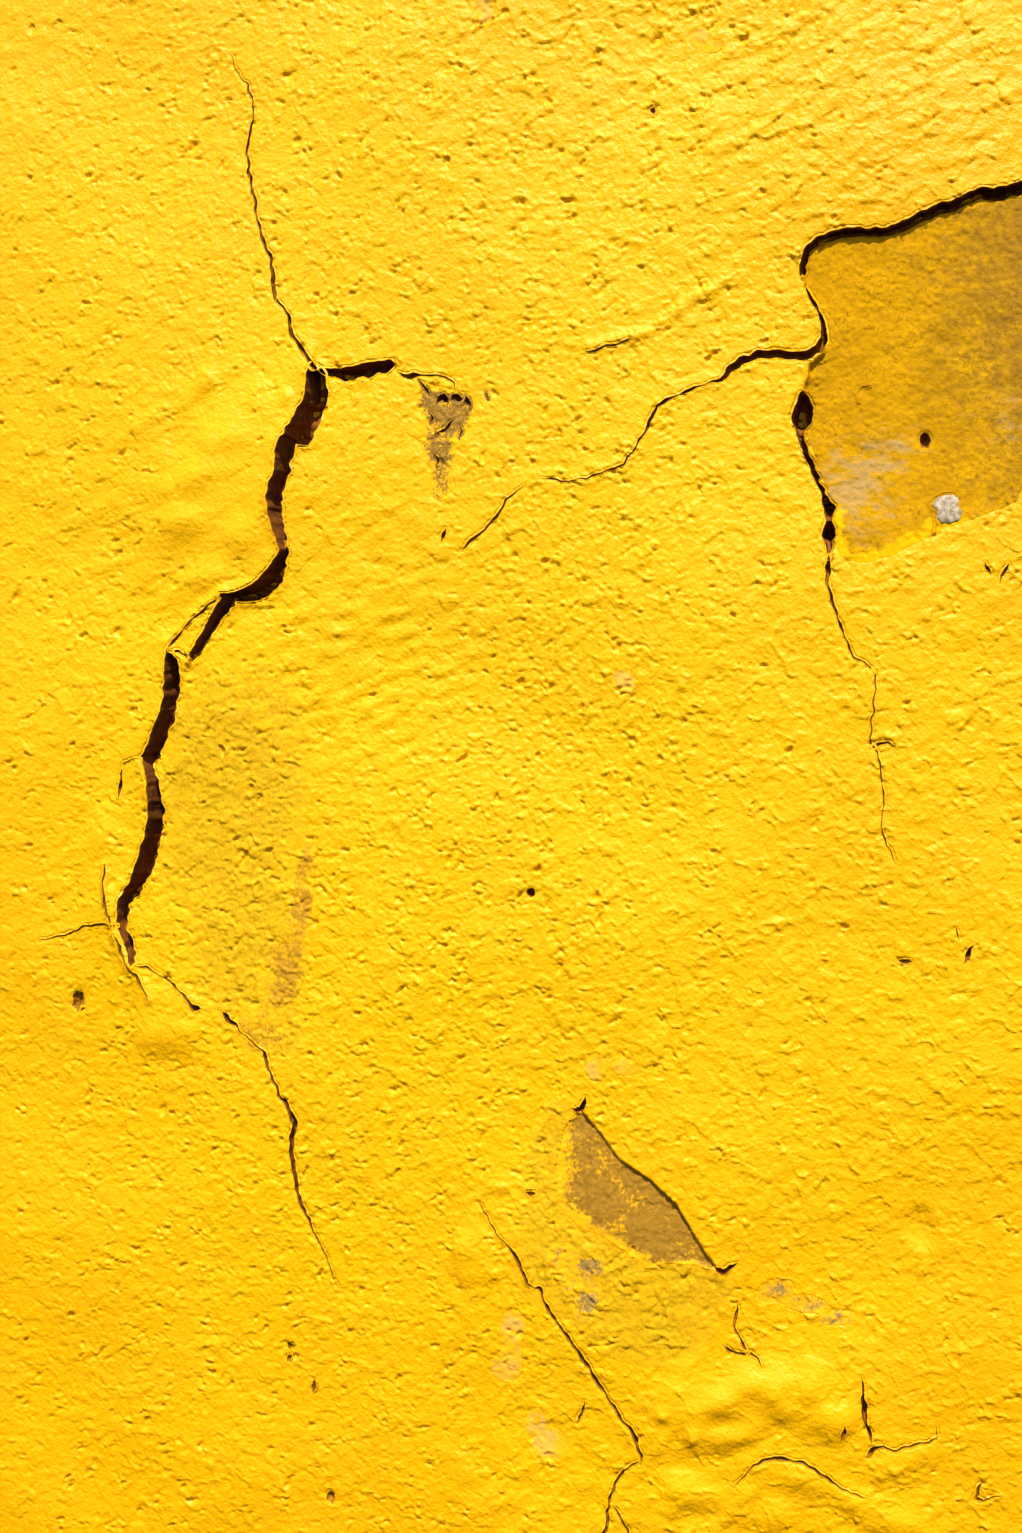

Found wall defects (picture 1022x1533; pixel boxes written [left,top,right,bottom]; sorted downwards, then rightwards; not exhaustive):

peeling [415,379,490,502]
crack [439,285,829,552]
spalling [789,178,1022,675]
crack [37,52,458,1289]
crack [867,668,898,865]
peeling [556,1095,739,1277]
crack [477,1200,645,1533]
crack [722,1302,764,1370]
crack [732,1375,939,1500]